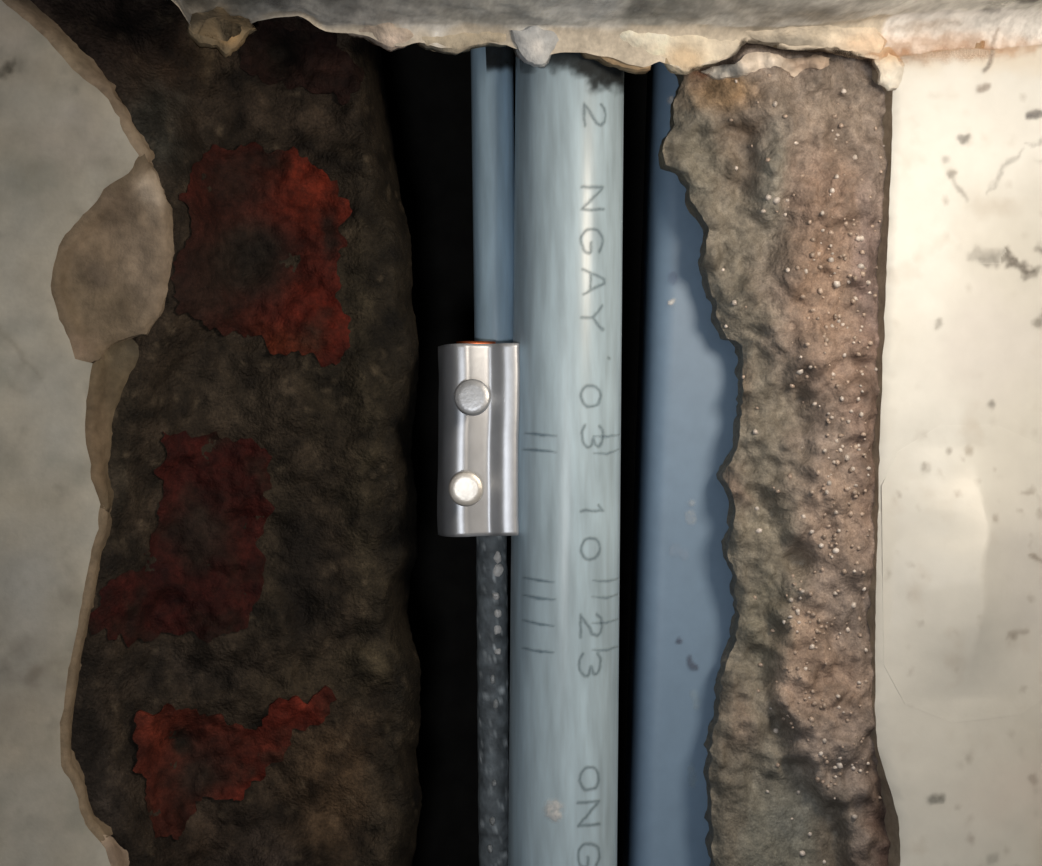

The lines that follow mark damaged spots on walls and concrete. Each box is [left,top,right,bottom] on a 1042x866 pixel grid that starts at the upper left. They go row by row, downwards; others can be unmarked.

spalling [2,0,559,866]
spalling [581,25,905,866]